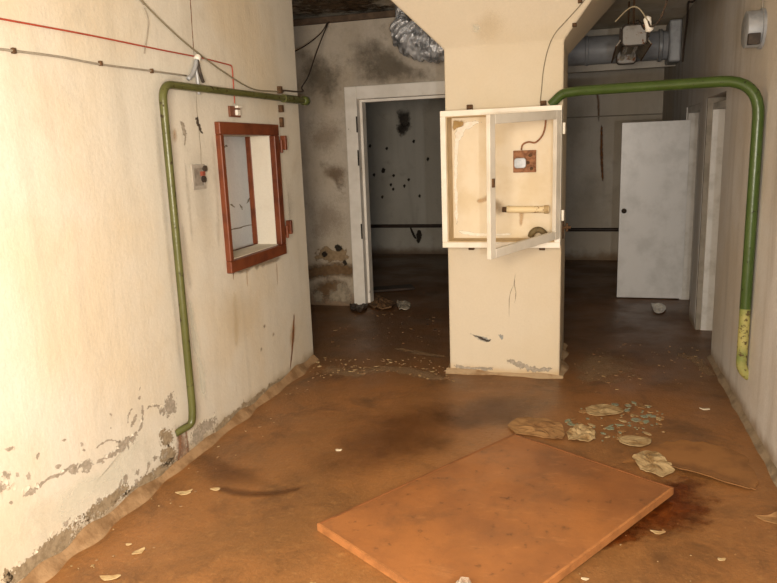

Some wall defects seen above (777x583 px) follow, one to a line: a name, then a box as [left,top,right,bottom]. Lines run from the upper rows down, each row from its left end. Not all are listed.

damp [292,0,392,16]
damp [361,47,410,79]
damp [308,262,353,303]
peeling [0,388,177,504]
spalling [188,377,284,447]
spalling [1,428,178,583]